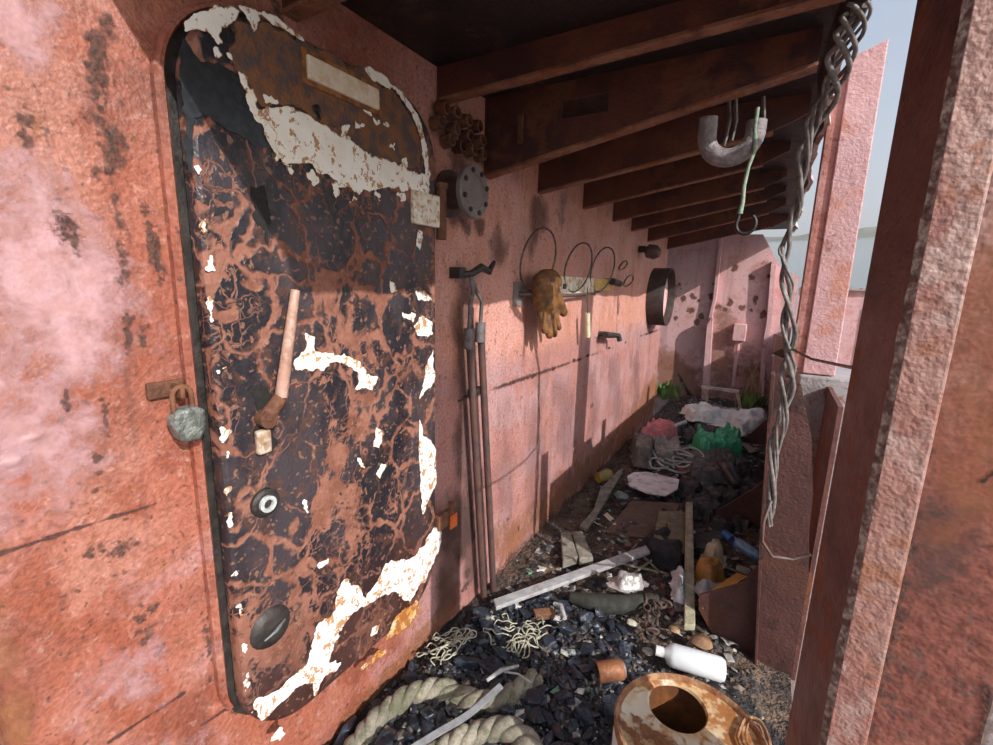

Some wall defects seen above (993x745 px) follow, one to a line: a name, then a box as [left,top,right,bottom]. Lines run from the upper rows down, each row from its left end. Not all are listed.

peeling [184,4,305,60]
corrosion [228,0,424,174]
peeling [238,66,431,203]
peeling [206,296,214,323]
peeling [402,312,433,337]
peeling [415,290,432,301]
peeling [419,350,435,399]
peeling [219,426,232,458]
peeling [418,420,437,514]
peeling [251,527,442,721]
corrosion [379,576,457,687]
peeling [270,727,286,742]